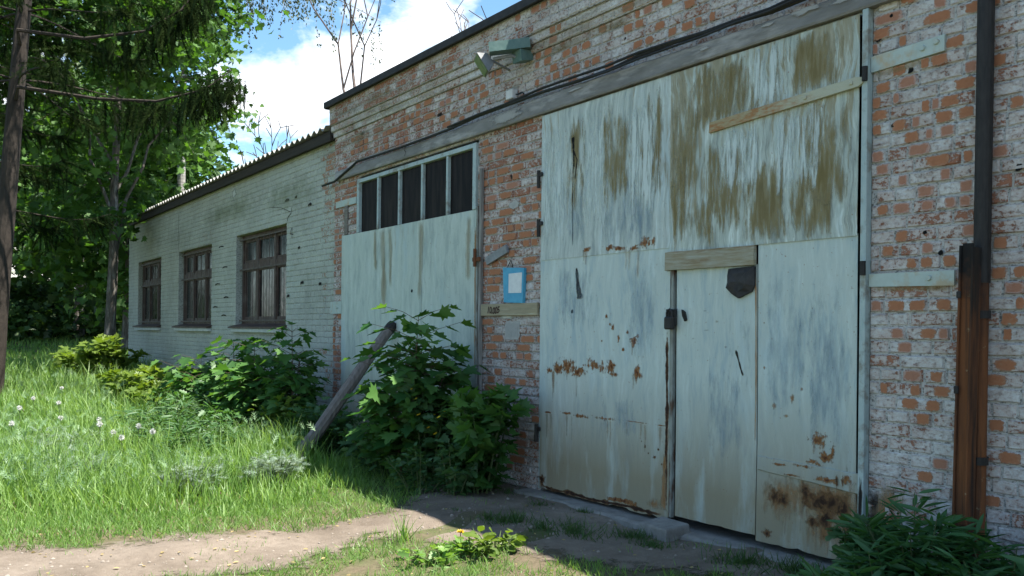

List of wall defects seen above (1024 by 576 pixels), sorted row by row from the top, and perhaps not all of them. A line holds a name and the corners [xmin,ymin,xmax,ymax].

peeling [923,0,951,25]
leakage [754,46,782,106]
leakage [627,106,659,215]
leakage [722,125,758,190]
leakage [777,103,820,190]
peeling [872,34,976,215]
rust [606,237,655,251]
peeling [871,299,951,311]
peeling [991,266,1024,340]
rust [539,338,669,515]
peeling [902,370,951,425]
rust [764,432,855,542]